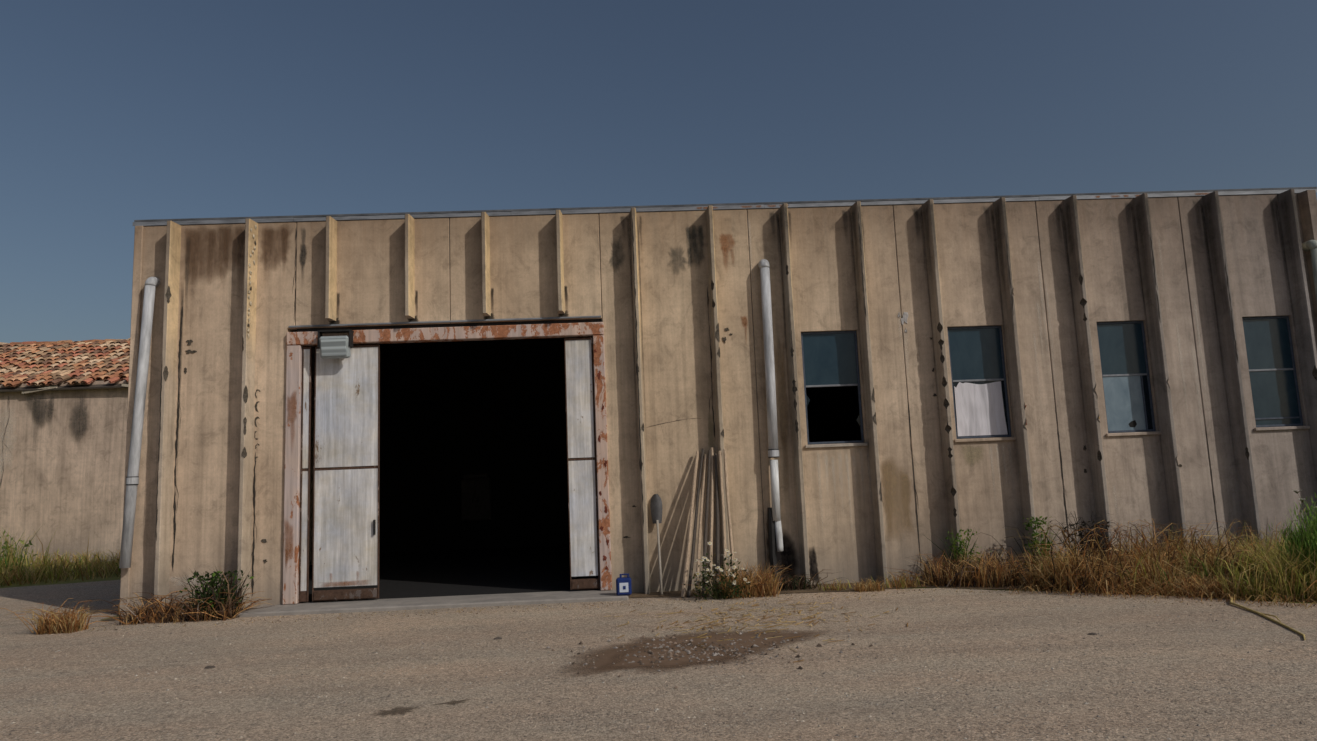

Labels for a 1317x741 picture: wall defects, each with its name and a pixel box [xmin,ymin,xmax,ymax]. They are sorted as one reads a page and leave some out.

leakage [673,231,701,262]